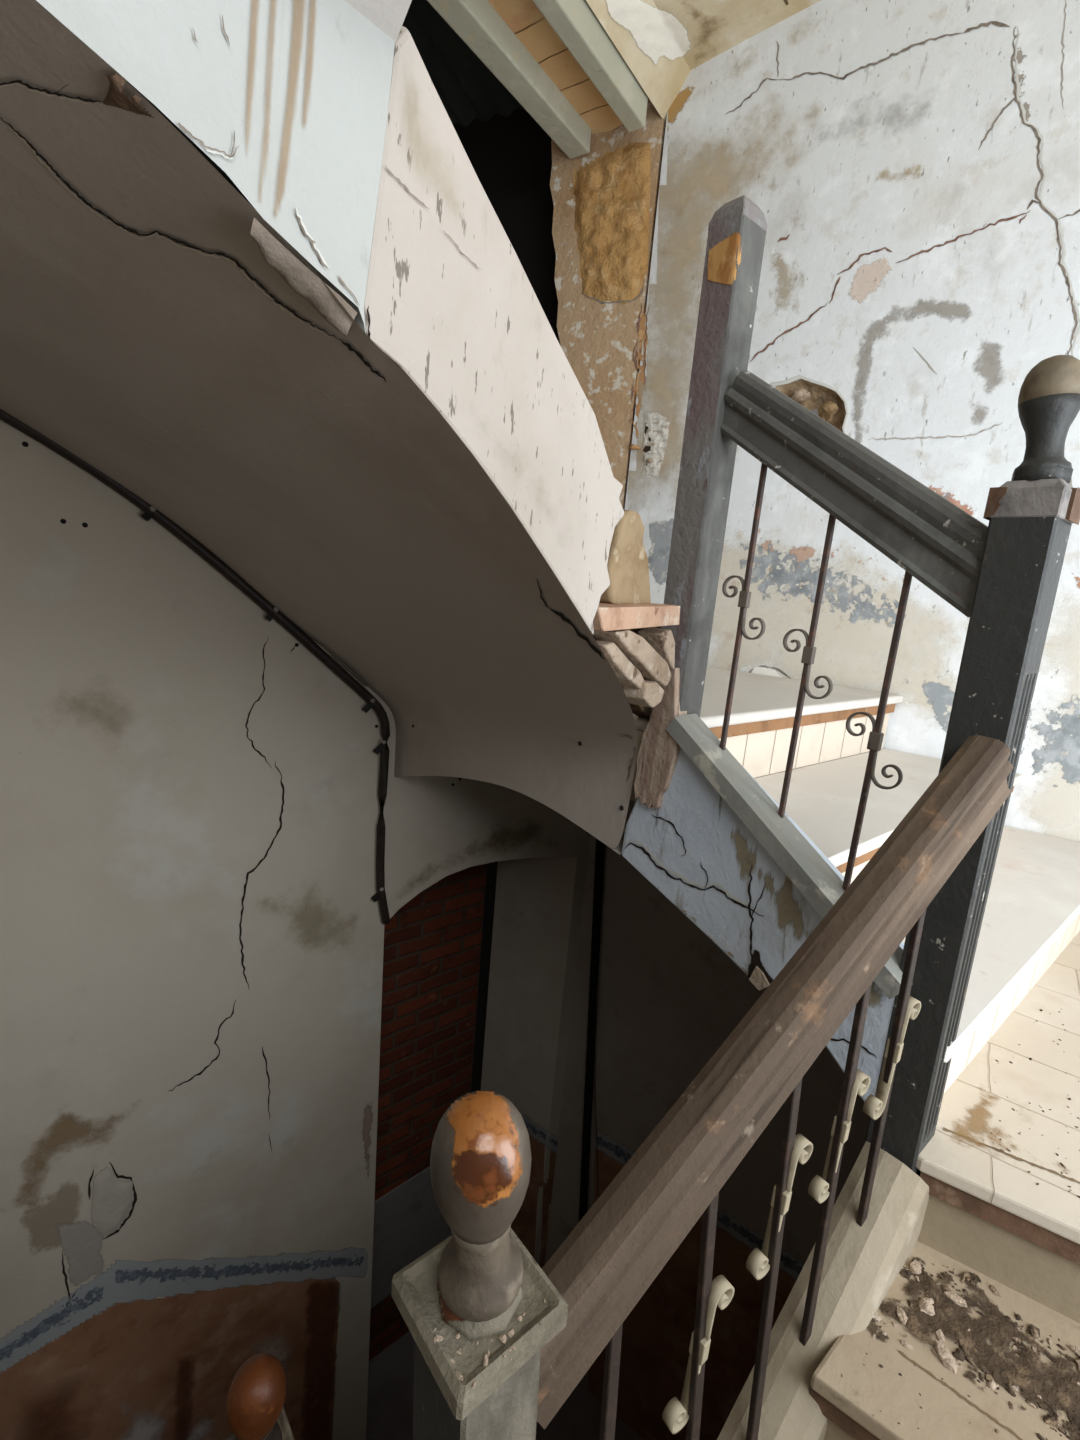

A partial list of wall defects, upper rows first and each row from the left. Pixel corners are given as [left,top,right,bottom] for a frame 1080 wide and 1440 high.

flaking render [606,0,691,65]
crack [0,80,386,382]
spalling [573,142,651,304]
crack [725,3,1080,362]
spalling [629,412,670,478]
crack [868,423,1002,440]
flaking render [599,510,674,604]
spalling [593,626,675,719]
peeling [1020,609,1080,842]
crack [169,641,295,1091]
crack [624,814,766,957]
leakage [18,1115,115,1201]